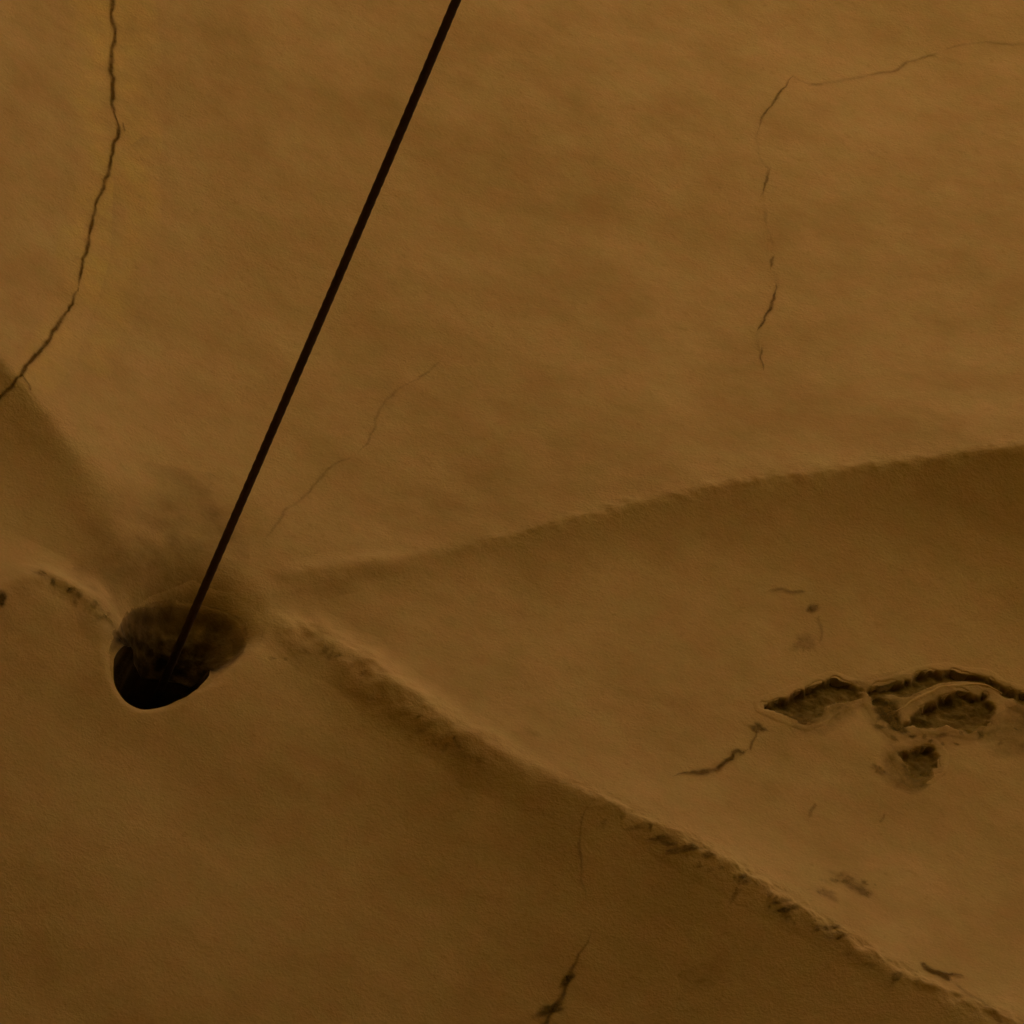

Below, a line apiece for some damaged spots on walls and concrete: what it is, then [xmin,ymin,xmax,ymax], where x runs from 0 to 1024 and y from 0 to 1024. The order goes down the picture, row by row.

crack [0,0,120,398]
flaking render [109,601,249,708]
crack [684,723,765,774]
flaking render [753,662,1024,788]
crack [540,965,575,1024]